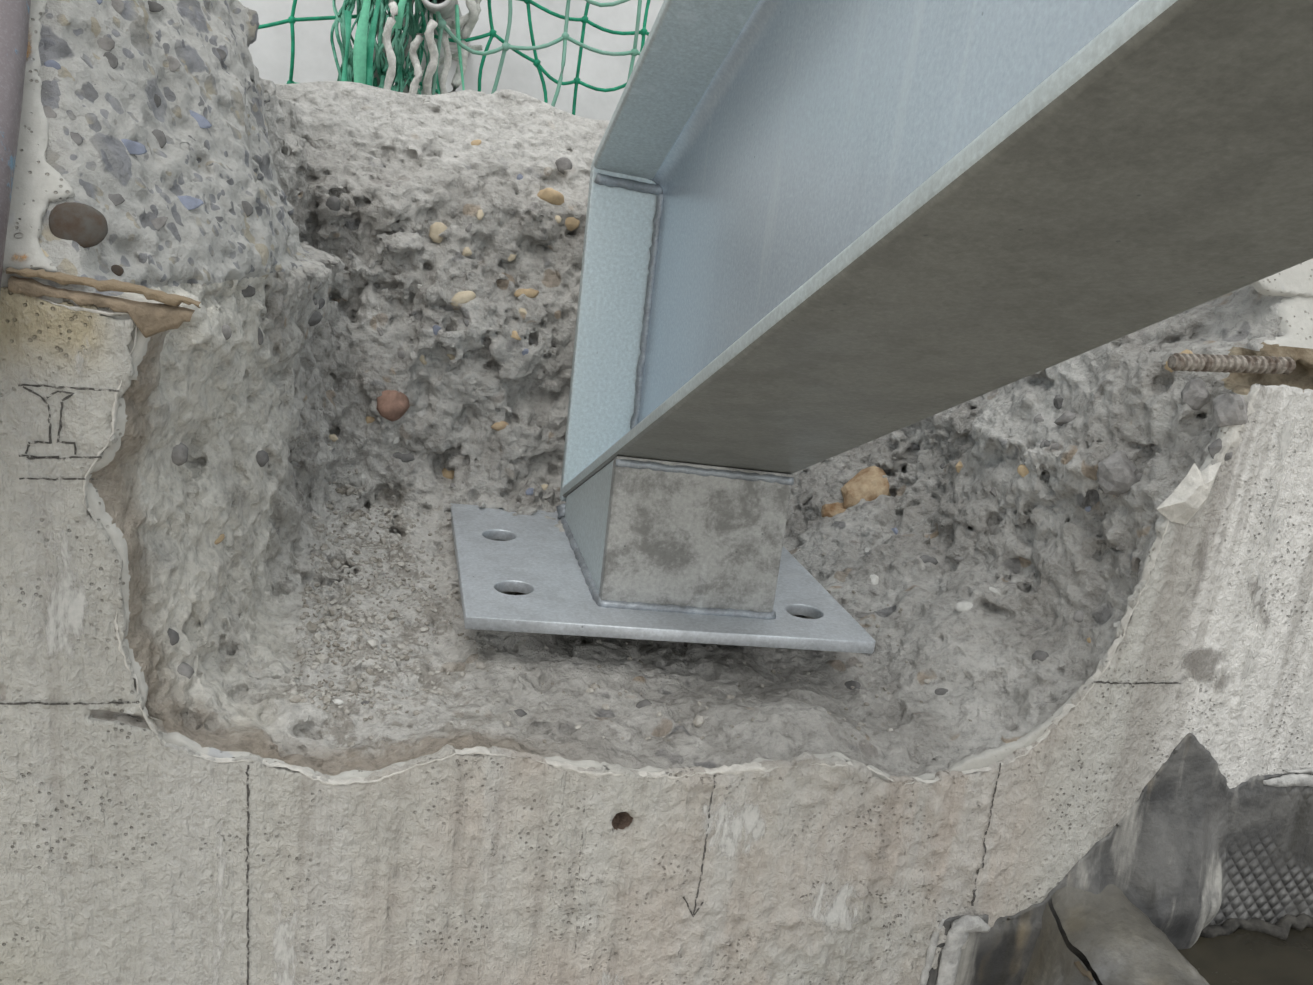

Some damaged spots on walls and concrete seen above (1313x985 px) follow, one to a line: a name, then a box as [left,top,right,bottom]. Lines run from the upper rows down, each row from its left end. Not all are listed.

spalling [18,0,1296,786]